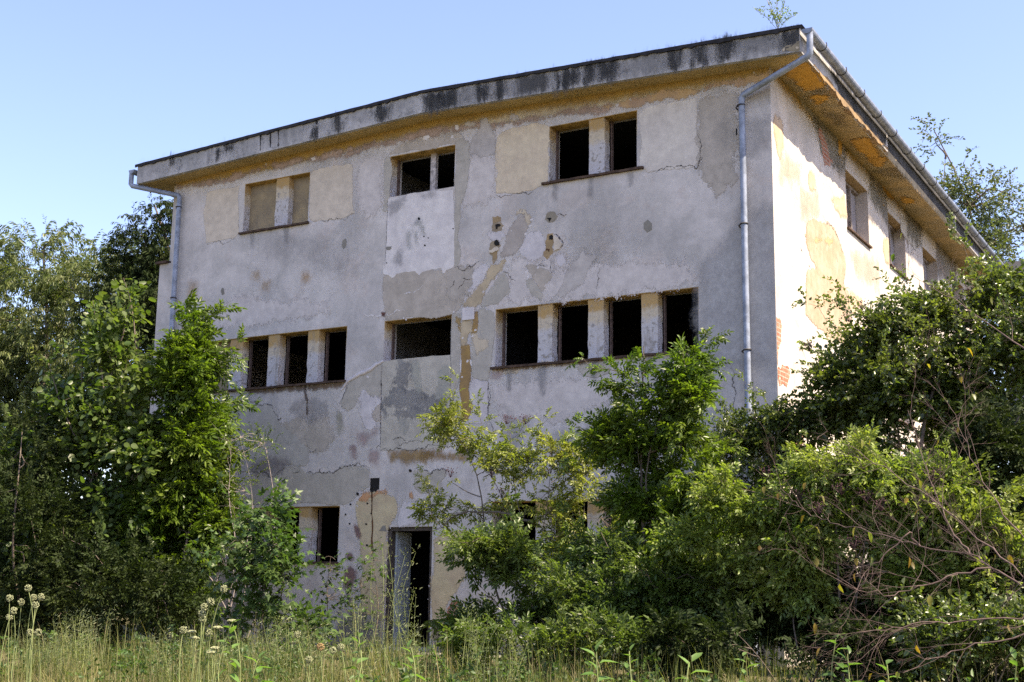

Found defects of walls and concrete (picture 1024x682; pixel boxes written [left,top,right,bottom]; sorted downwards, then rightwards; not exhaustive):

water stain [176,46,922,243]
peeling [800,99,867,167]
spalling [808,62,888,153]
flaking render [176,69,790,426]
peeling [805,218,851,342]
flaking render [226,394,447,621]